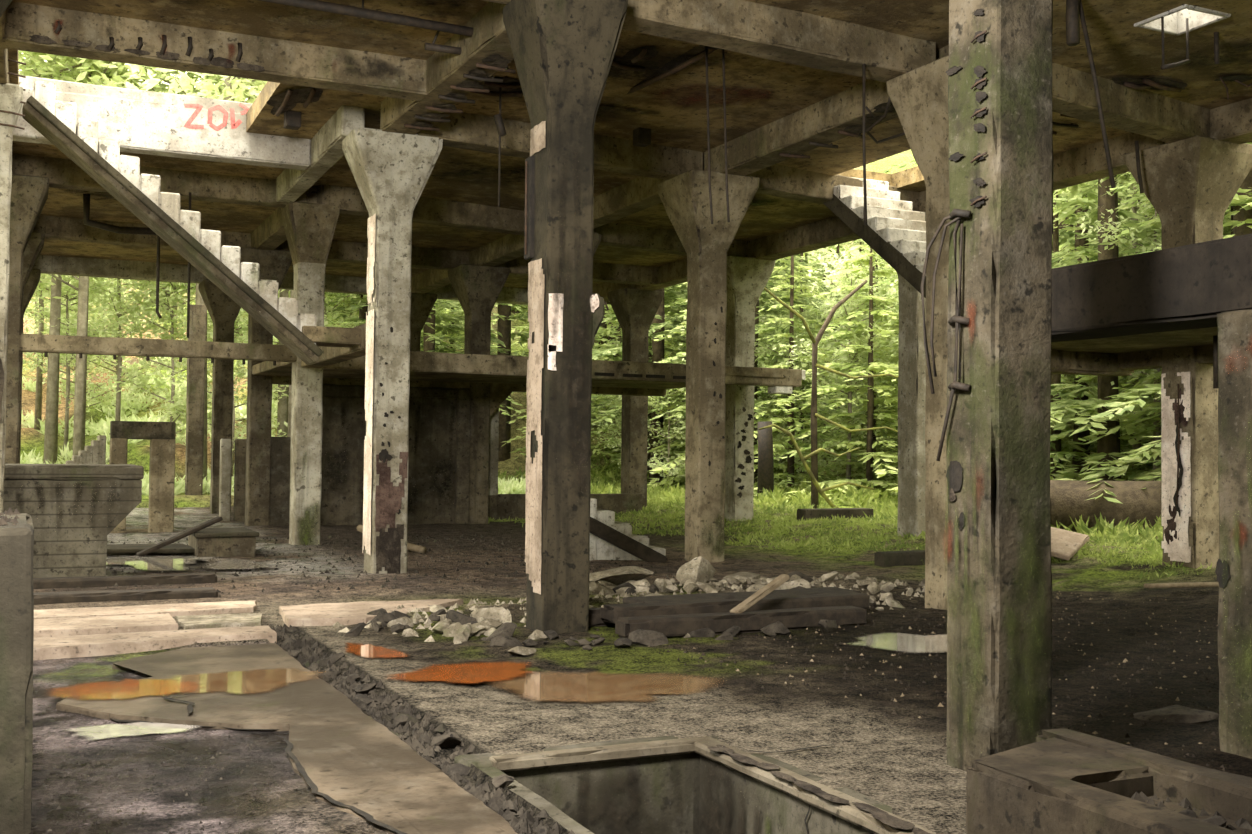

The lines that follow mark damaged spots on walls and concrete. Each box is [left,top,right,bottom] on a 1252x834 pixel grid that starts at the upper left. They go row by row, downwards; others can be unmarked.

peeling [362,213,408,574]
crack [110,693,407,834]